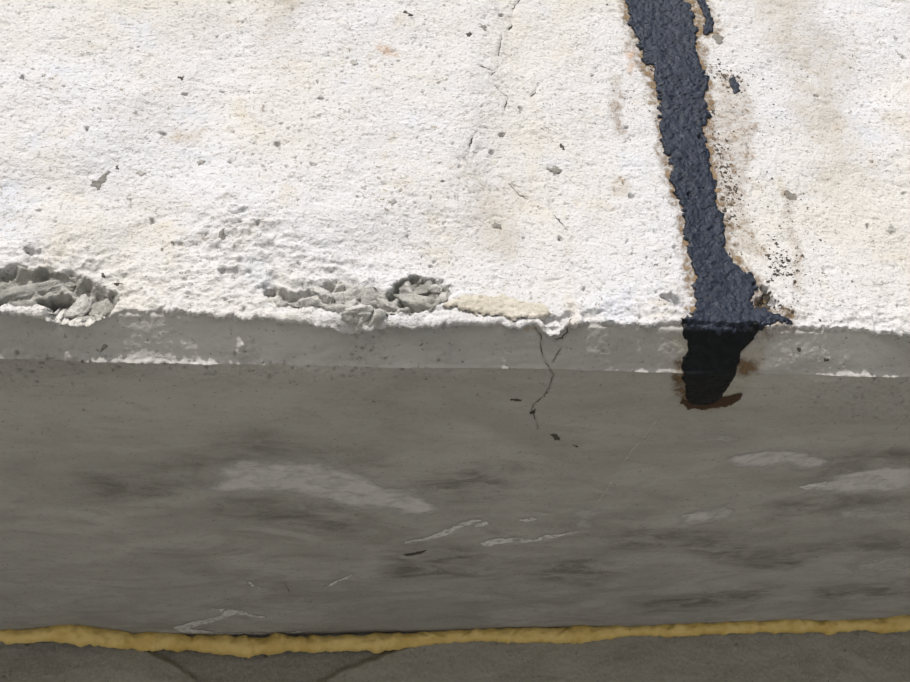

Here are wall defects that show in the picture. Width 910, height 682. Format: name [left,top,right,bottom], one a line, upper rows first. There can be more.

crack [481,0,520,108]
spalling [0,264,123,322]
spalling [264,274,552,329]
crack [531,319,571,427]